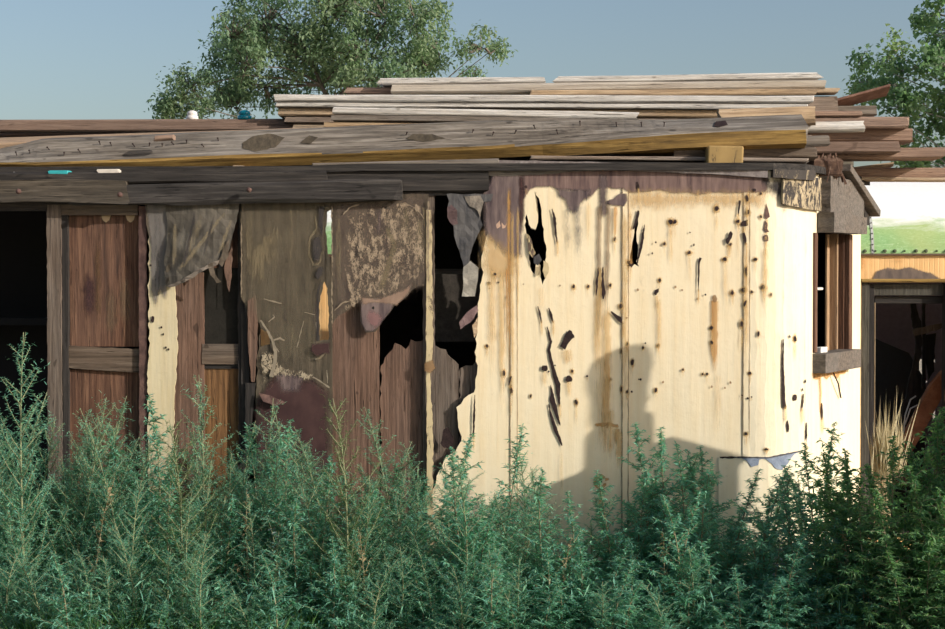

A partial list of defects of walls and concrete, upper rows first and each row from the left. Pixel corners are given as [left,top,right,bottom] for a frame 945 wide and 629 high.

peeling [146,205,168,302]
peeling [331,201,430,324]
crack [538,307,562,446]
rust [488,171,781,347]
rust [697,294,718,375]
rust [873,267,940,279]